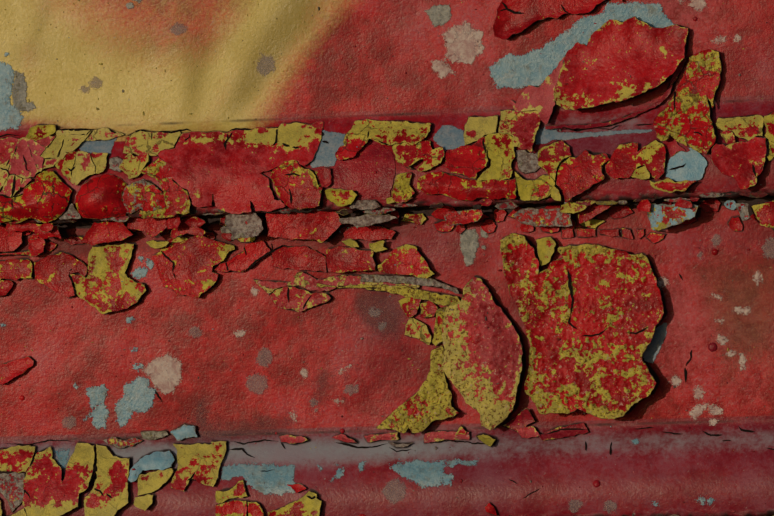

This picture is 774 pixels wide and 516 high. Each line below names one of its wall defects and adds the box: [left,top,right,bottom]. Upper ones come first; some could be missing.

peeling [0,0,774,314]
peeling [0,363,322,516]
peeling [255,244,523,444]
peeling [389,458,479,489]
peeling [503,408,588,441]
peeling [500,233,667,420]